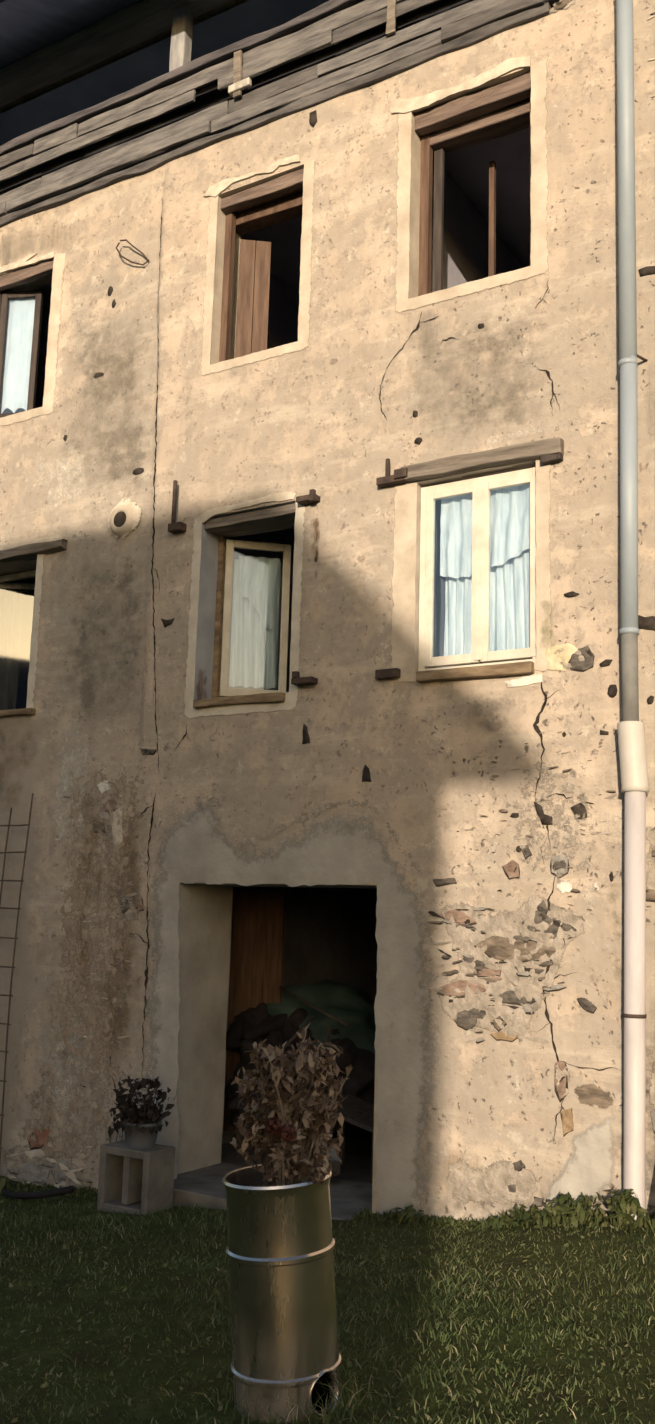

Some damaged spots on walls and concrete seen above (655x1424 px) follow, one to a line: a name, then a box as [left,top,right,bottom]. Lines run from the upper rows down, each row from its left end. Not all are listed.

crack [379,312,459,419]
crack [539,369,560,416]
crack [105,340,190,1089]
flaking render [91,781,123,846]
flaking render [425,752,616,1044]
crack [530,682,617,1071]
flaking render [2,1128,93,1189]